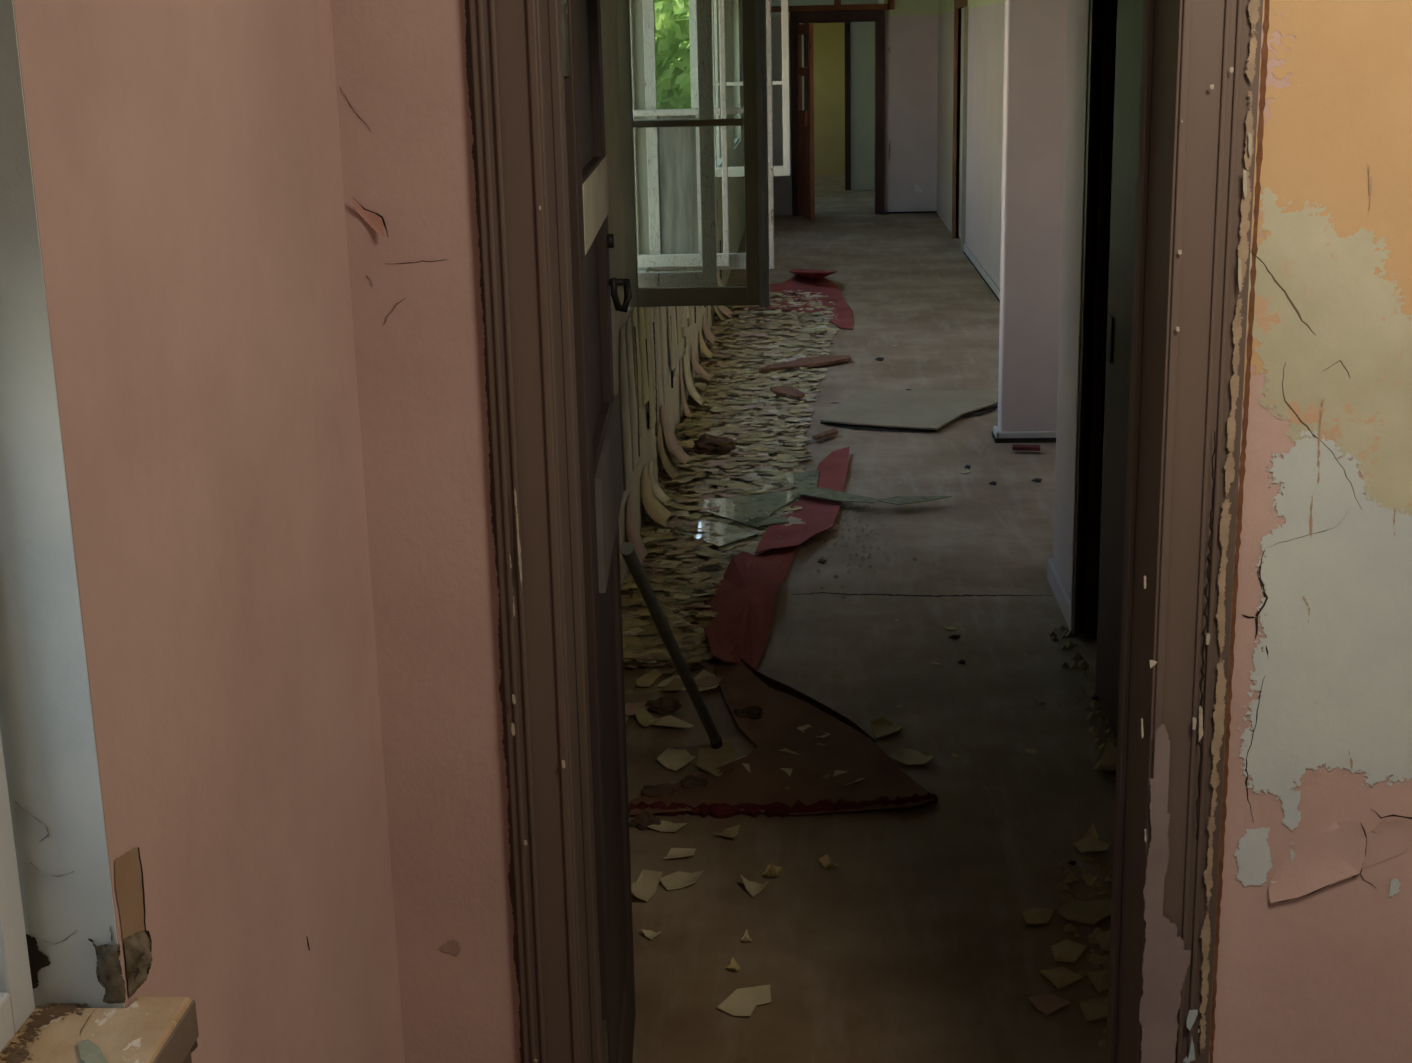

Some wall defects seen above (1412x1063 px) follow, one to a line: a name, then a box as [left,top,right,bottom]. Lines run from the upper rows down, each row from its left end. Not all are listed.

crack [1250,250,1314,333]
peeling [1139,0,1412,1063]
crack [1196,363,1359,840]
spalling [88,929,153,1004]